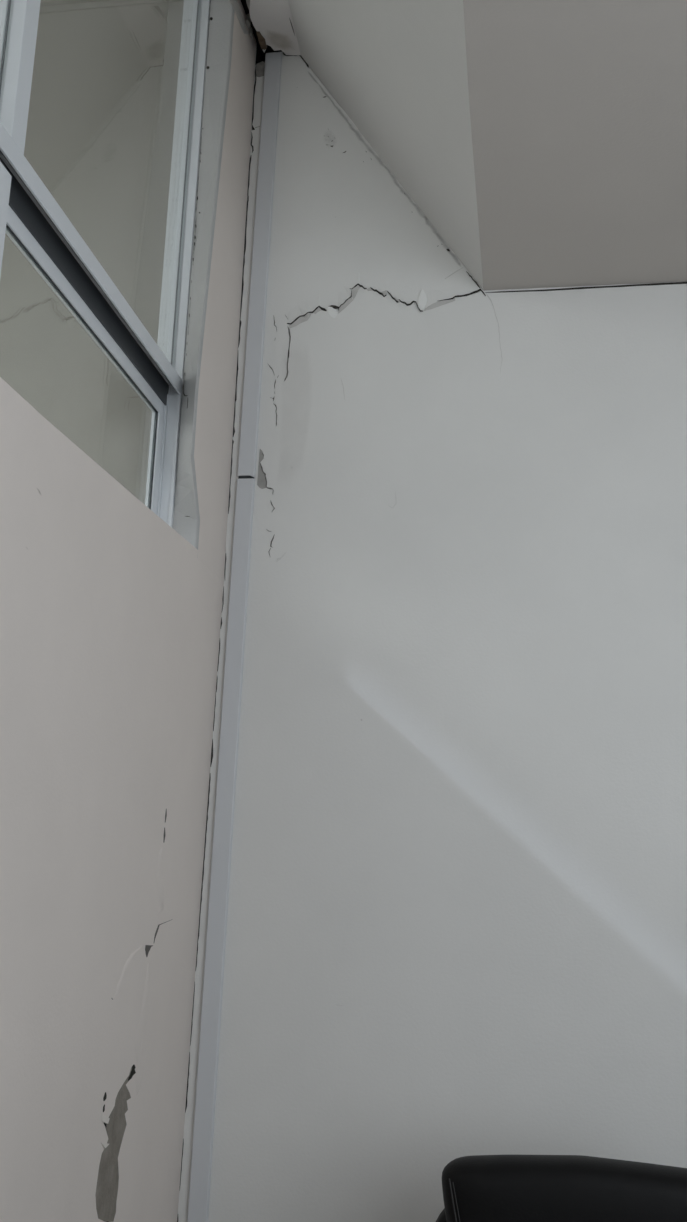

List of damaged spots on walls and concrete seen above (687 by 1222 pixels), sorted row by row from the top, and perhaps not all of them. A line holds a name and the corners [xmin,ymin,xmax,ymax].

crack [228,67,260,514]
crack [268,249,687,425]
peeling [257,449,272,489]
crack [145,556,226,1222]
spalling [96,1064,136,1222]